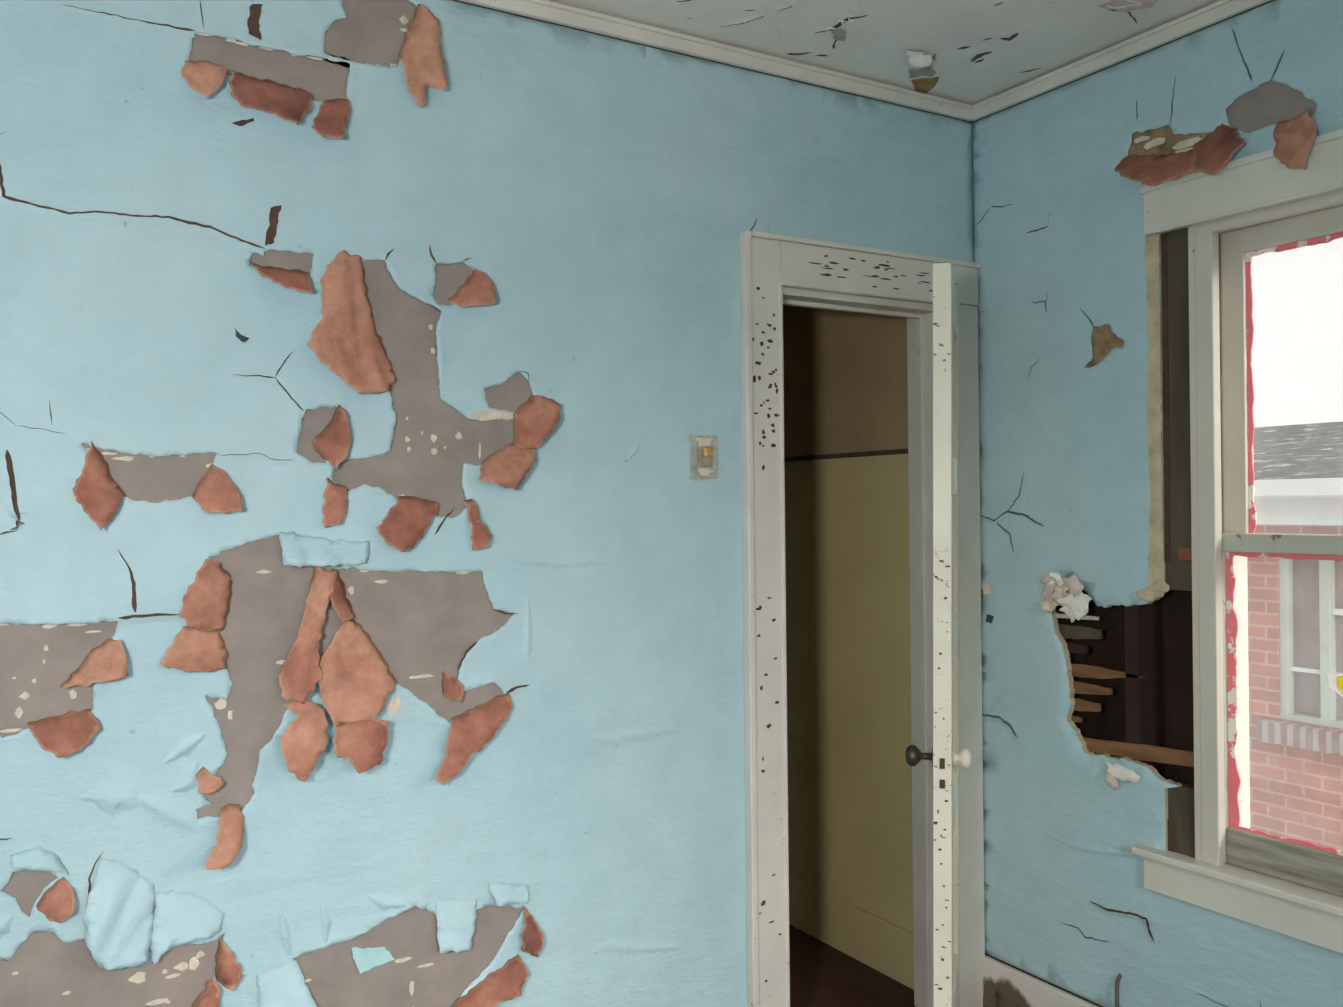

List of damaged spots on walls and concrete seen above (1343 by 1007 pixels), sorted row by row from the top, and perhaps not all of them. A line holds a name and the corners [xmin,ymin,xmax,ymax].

peeling [181,0,448,139]
peeling [1097,0,1158,23]
peeling [1114,28,1317,186]
crack [0,132,265,255]
peeling [71,441,243,531]
peeling [159,205,561,870]
crack [980,473,1044,553]
spalling [1040,234,1194,851]
peeling [0,621,128,758]
peeling [0,846,543,1007]
crack [1061,901,1155,944]